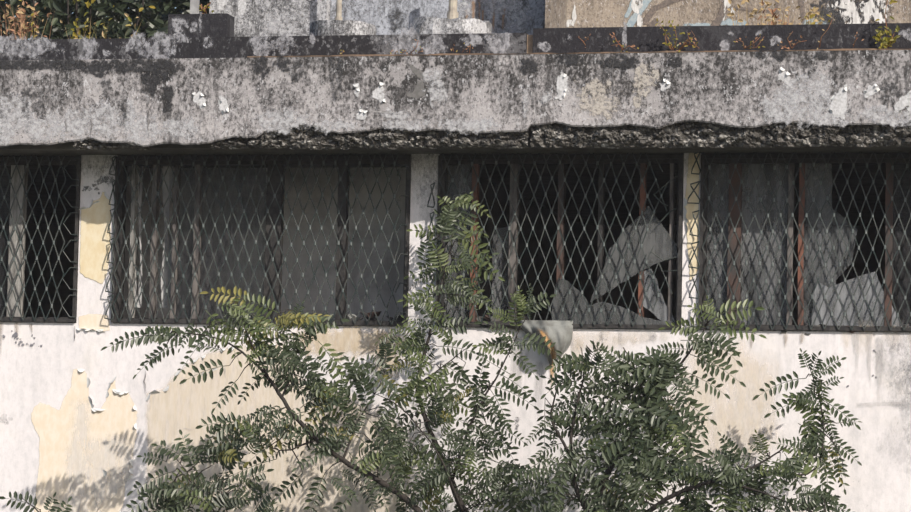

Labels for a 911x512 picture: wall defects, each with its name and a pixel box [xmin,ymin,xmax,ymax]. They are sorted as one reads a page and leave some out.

mould [0,57,185,124]
mould [251,54,304,83]
peeling [632,59,671,108]
spalling [211,67,911,280]
peeling [79,191,112,284]
peeling [76,314,110,333]
peeling [31,343,409,512]